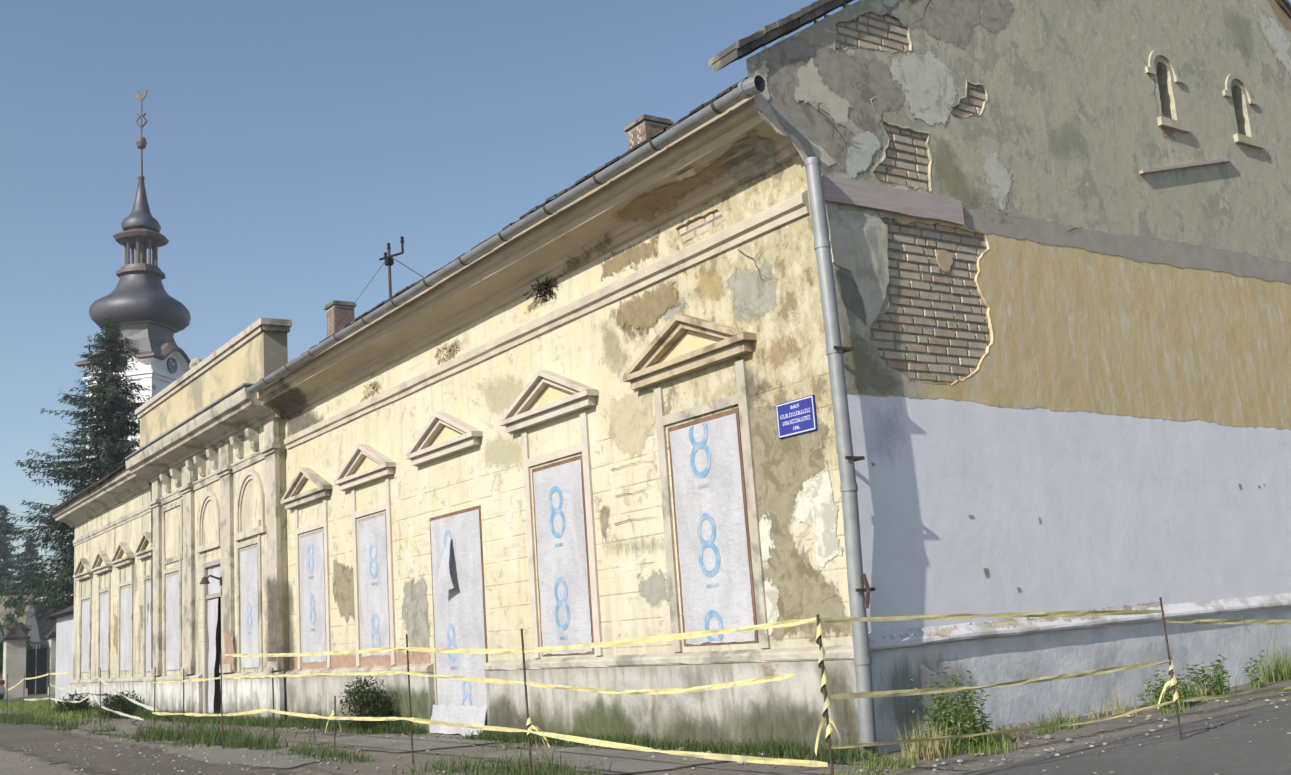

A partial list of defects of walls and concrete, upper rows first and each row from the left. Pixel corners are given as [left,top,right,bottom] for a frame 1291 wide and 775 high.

flaking render [753,0,1014,193]
flaking render [675,208,725,246]
flaking render [836,215,994,387]
flaking render [749,405,851,642]
flaking render [333,559,355,622]
flaking render [402,578,430,655]
flaking render [637,570,669,606]